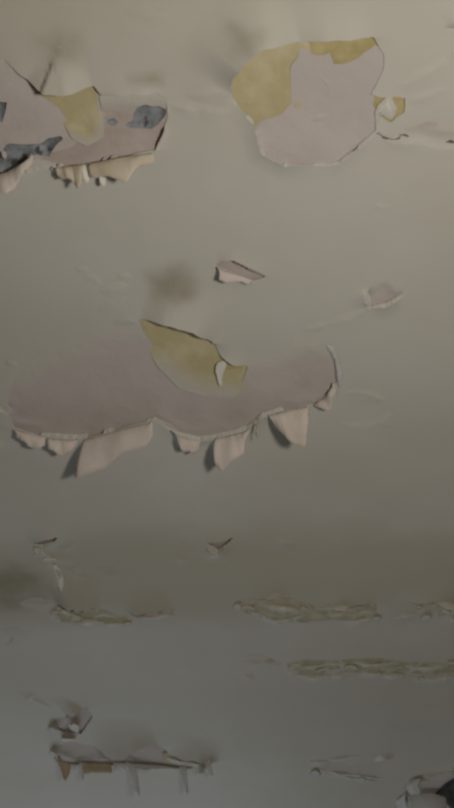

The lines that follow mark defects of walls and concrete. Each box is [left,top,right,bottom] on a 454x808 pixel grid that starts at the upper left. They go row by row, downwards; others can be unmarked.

peeling [0,41,185,197]
peeling [212,17,423,179]
peeling [0,305,353,478]
peeling [43,703,222,796]
peeling [395,768,454,808]